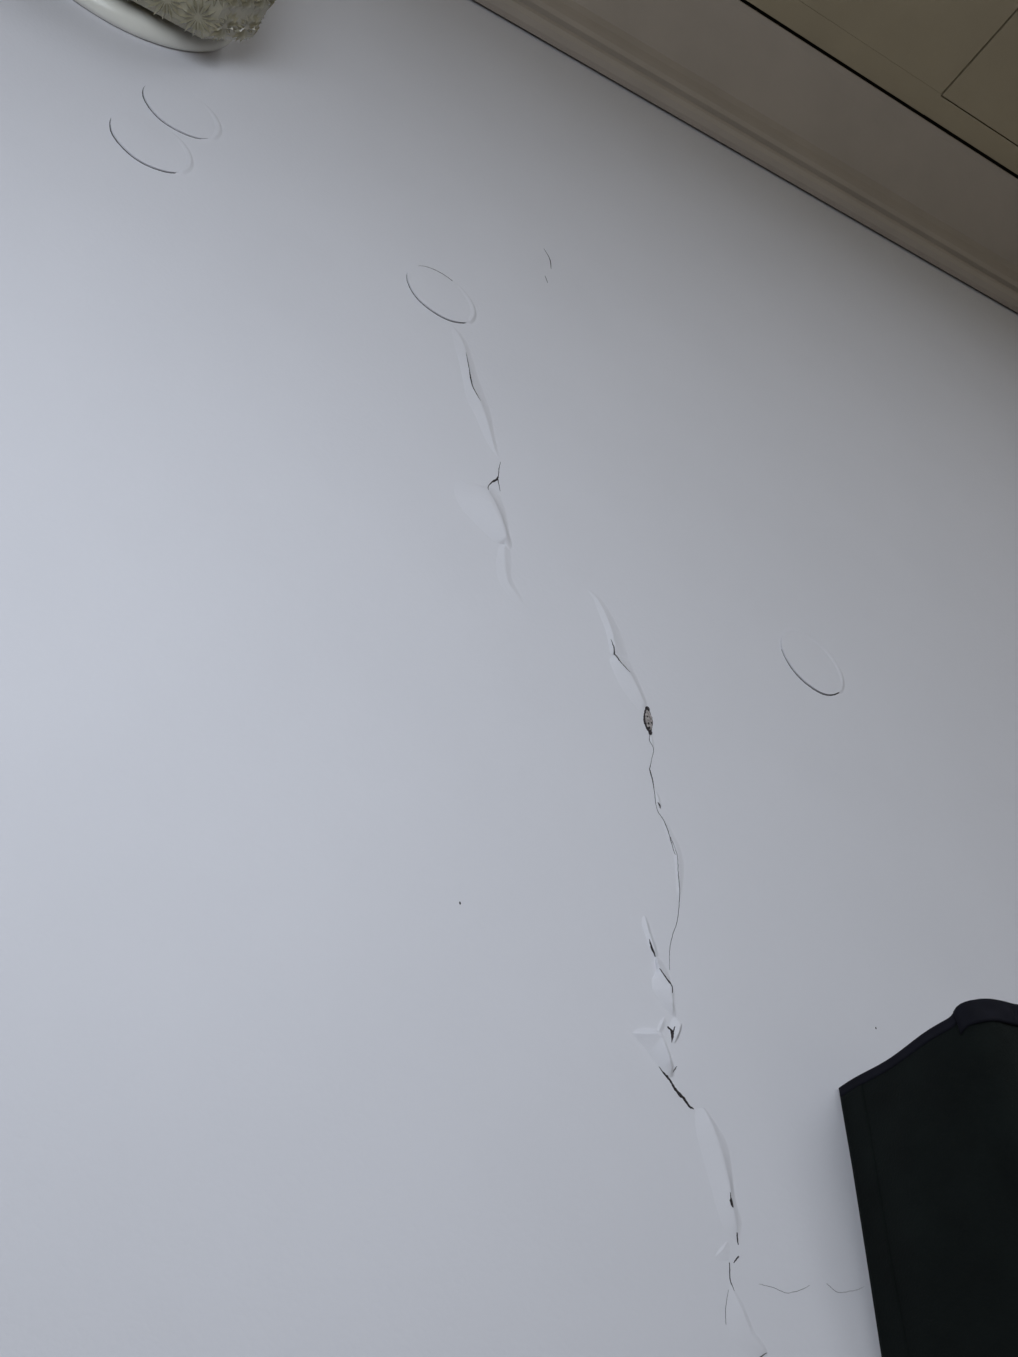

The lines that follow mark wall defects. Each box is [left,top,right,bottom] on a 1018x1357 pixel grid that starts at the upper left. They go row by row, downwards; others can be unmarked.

crack [449,322,524,606]
spalling [643,706,653,735]
crack [587,589,859,1357]